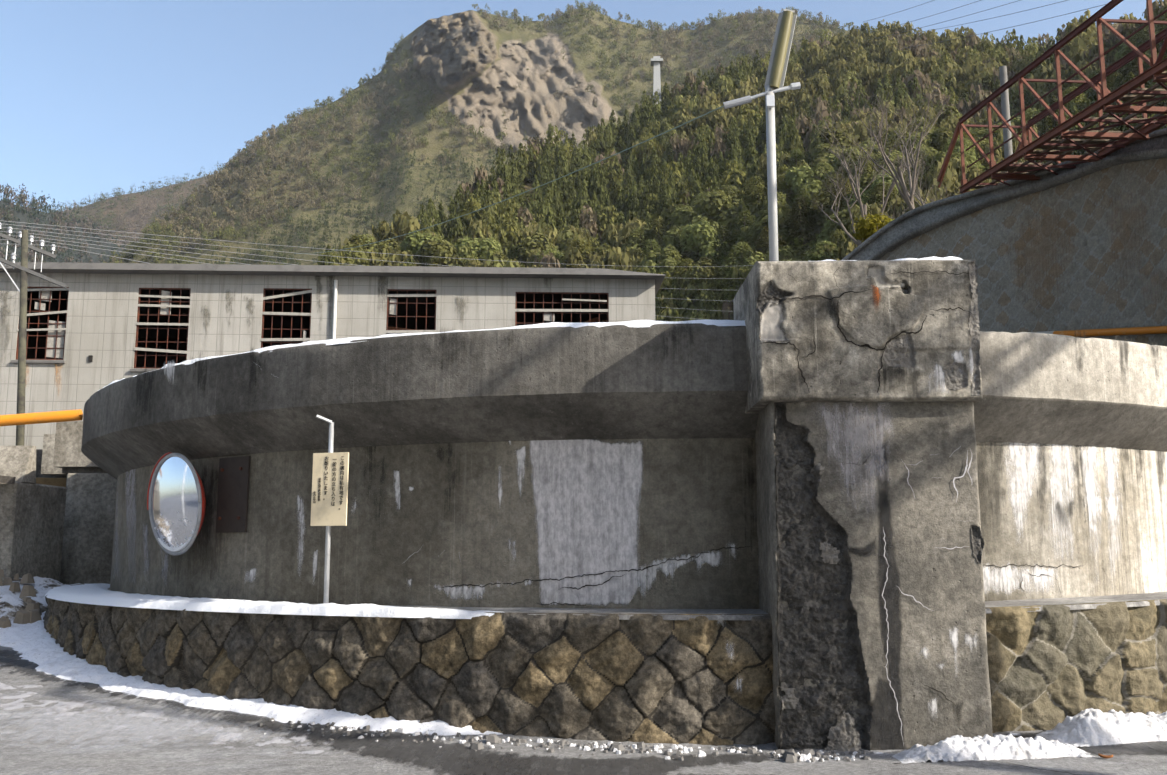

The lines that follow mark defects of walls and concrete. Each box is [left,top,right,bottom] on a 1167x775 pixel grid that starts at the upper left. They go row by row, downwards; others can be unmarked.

crack [759,269,974,393]
leakage [977,443,1143,556]
crack [402,544,750,607]
spalling [775,402,872,752]
leakage [821,403,906,750]
crack [847,531,930,746]
efflorescence [983,565,1054,592]